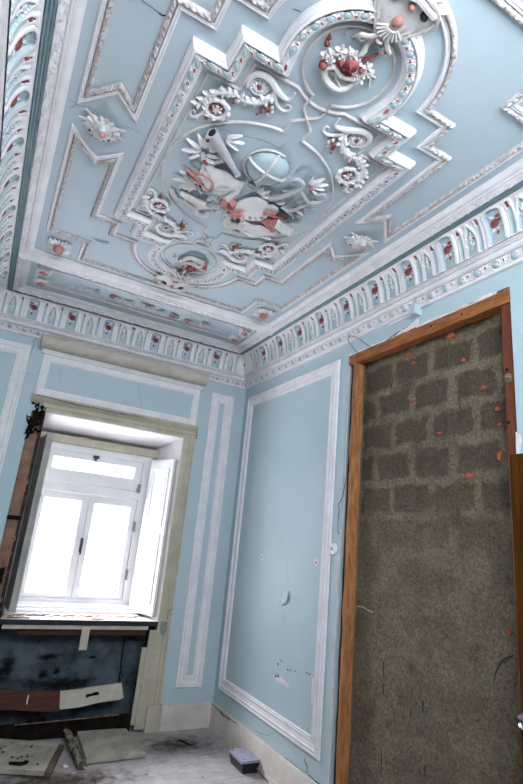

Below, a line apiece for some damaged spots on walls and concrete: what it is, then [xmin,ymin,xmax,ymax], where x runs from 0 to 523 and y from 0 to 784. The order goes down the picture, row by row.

flaking render [0,402,47,616]